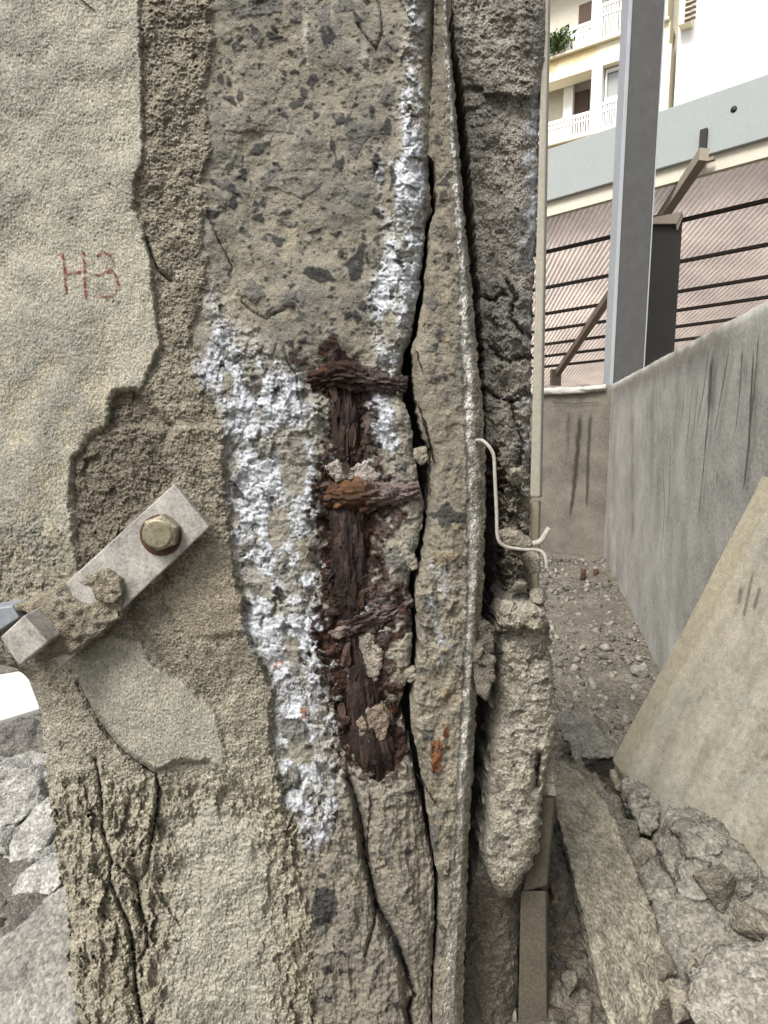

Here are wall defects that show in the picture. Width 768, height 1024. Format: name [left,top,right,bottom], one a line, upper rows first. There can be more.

crack [79,684,160,1024]
spalling [0,0,435,1024]
leakage [197,298,338,850]
corrosion [288,344,306,365]
corrosion [318,337,361,364]
corrosion [300,384,412,783]
crack [349,780,416,1024]
leakage [367,393,399,454]
leakage [370,0,428,378]
crack [400,179,438,901]
corrosion [429,724,449,773]
crack [483,284,531,362]